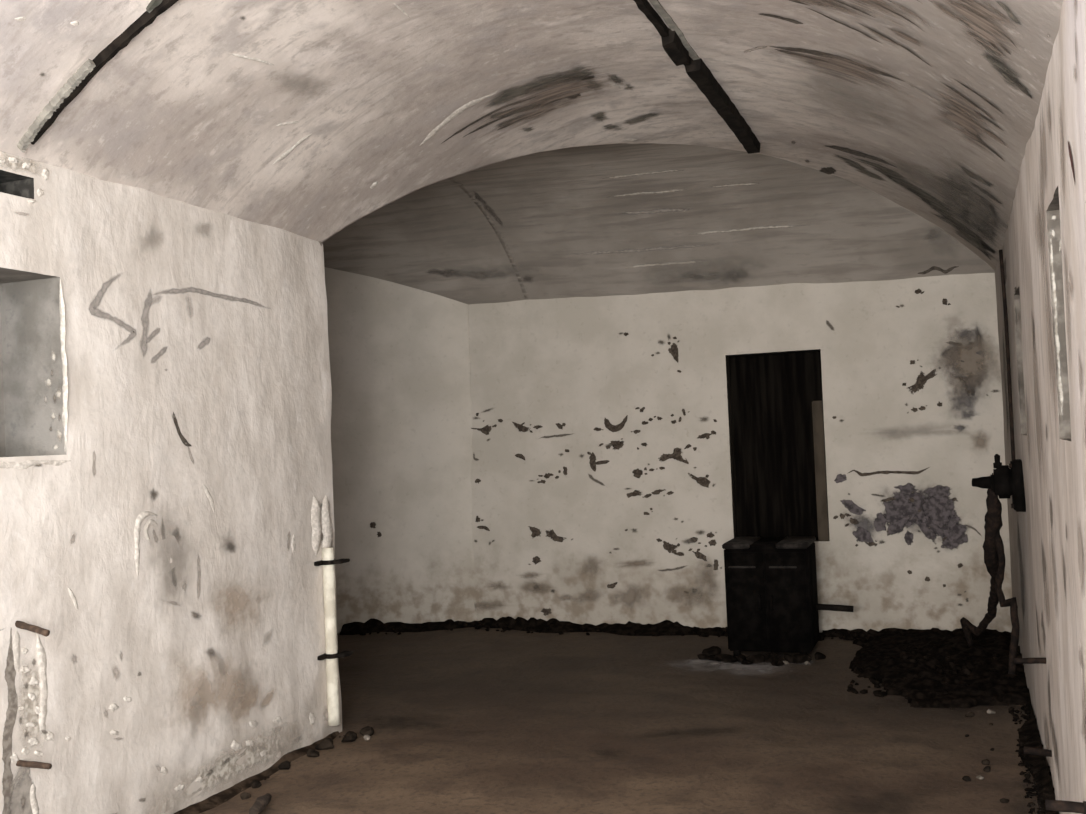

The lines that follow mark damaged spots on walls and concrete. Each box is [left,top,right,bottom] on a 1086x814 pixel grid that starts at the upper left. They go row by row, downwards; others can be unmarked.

damp [789,0,932,67]
damp [931,0,1032,98]
damp [442,68,632,143]
damp [592,113,657,129]
damp [820,146,1002,259]
damp [943,330,1047,462]
peeling [471,407,686,486]
peeling [626,418,717,515]
peeling [528,526,572,542]
peeling [656,531,722,571]
peeling [833,467,981,552]
spalling [2,628,72,814]